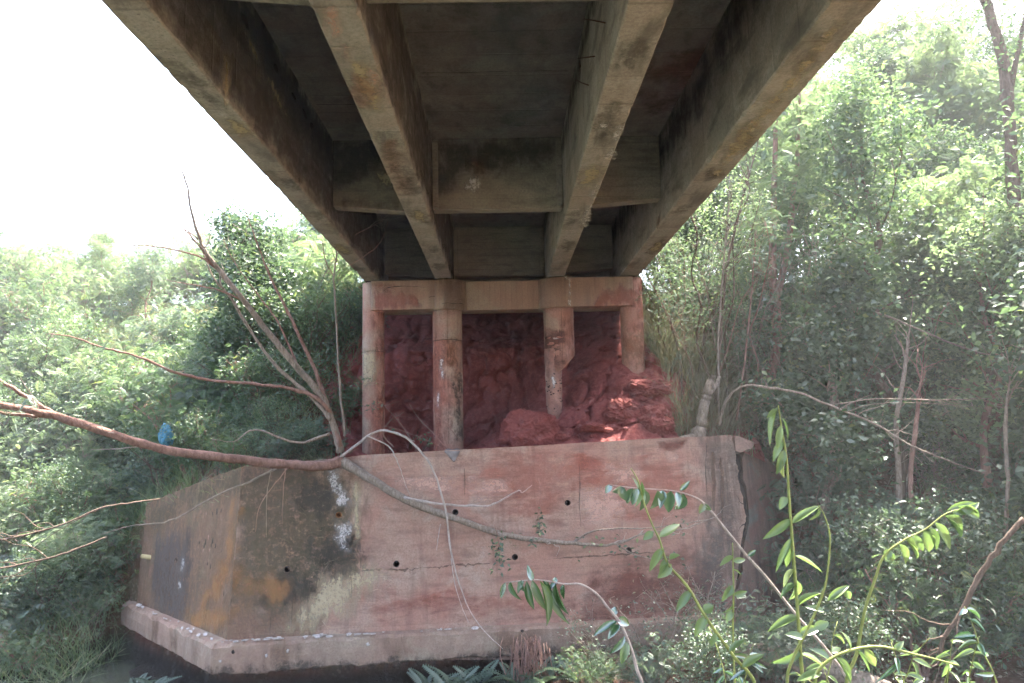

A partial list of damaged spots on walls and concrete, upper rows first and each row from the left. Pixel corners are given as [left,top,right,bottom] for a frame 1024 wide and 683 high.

damp [151,469,377,630]
crack [362,563,490,572]
crack [554,551,654,559]
crack [736,454,747,579]